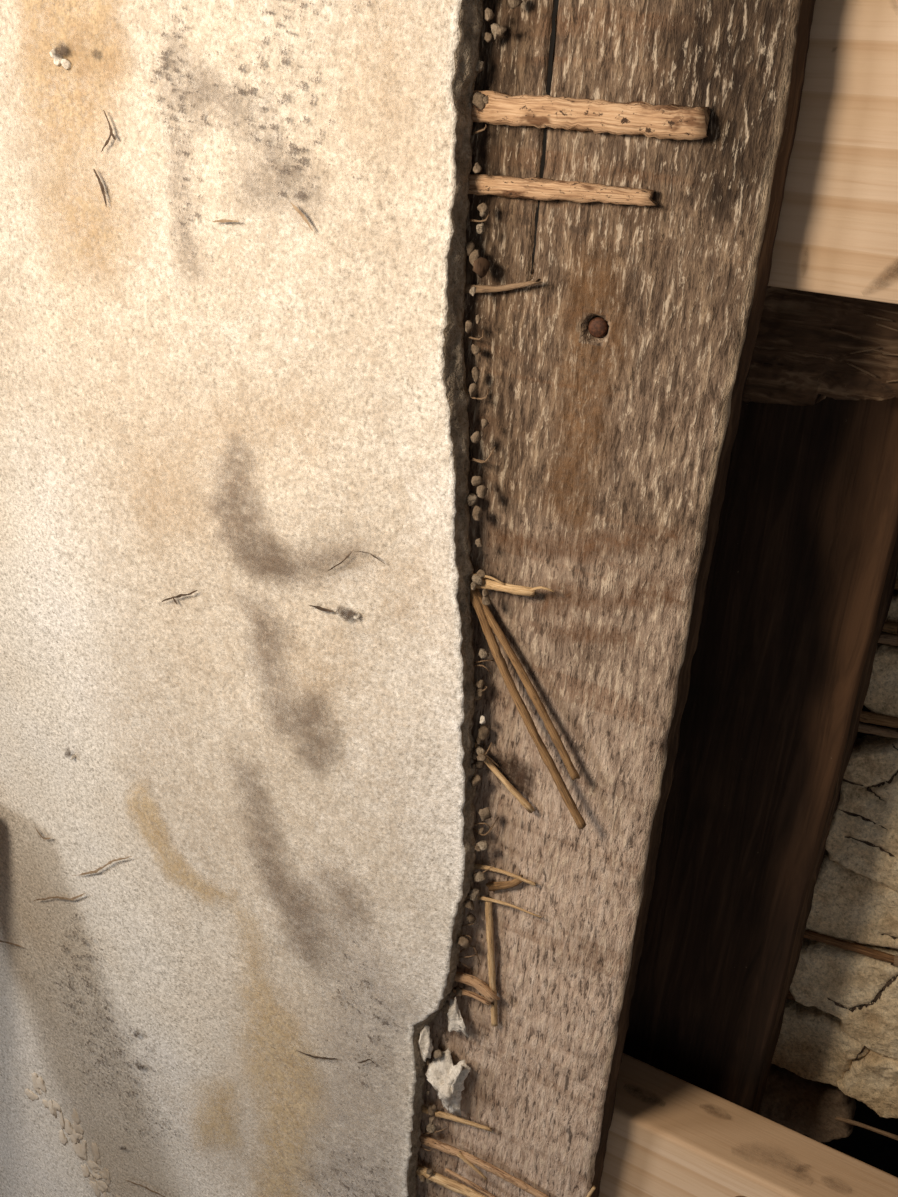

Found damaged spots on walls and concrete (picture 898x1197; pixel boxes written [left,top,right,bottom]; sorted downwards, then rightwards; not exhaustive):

damp [22,0,117,154]
damp [150,6,218,261]
damp [227,1,333,201]
flaking render [484,7,507,43]
flaking render [465,202,491,296]
flaking render [465,314,489,400]
flaking render [466,419,496,521]
flaking render [471,716,500,788]
crack [839,744,898,857]
damp [42,914,232,1168]
damp [321,941,403,1088]
crack [828,934,898,1012]